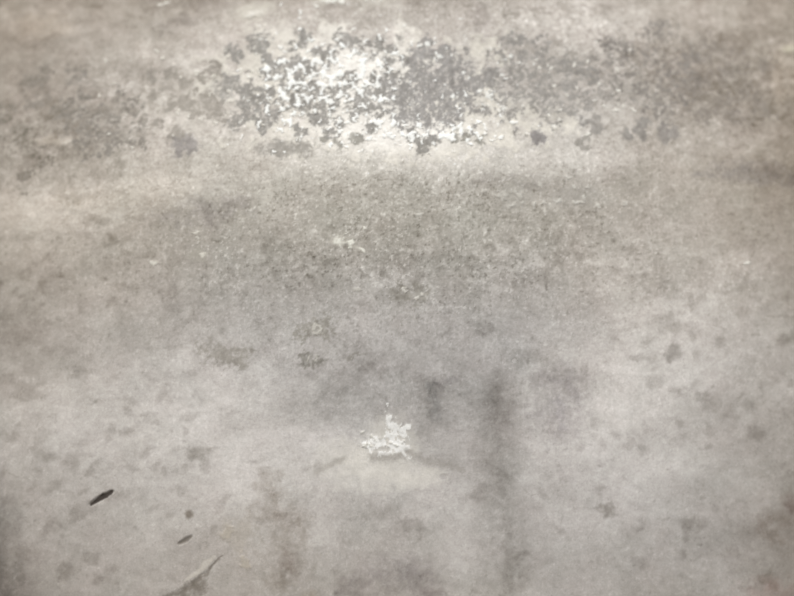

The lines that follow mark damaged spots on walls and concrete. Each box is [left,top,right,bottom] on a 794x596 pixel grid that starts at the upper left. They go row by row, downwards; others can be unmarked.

peeling [88,0,685,172]
leakage [183,507,196,521]
crack [161,555,224,596]
leakage [191,310,612,596]